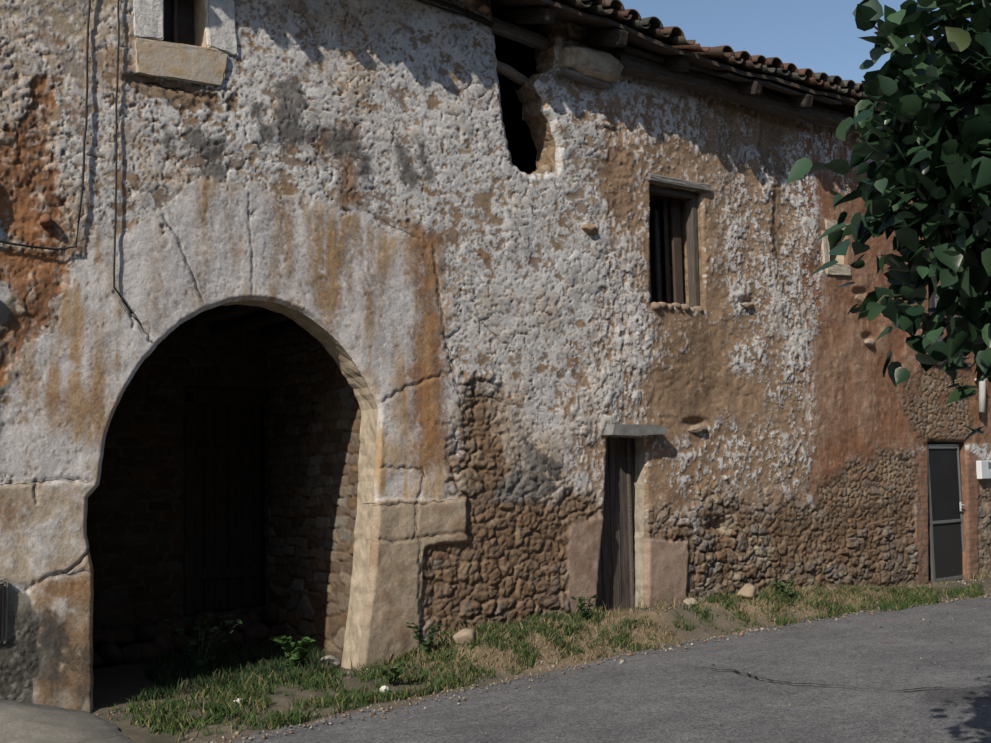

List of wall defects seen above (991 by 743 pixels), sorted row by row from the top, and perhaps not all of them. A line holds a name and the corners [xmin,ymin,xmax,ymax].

crack [138,82,211,97]
water stain [161,127,230,177]
water stain [251,76,372,181]
flaking render [0,73,73,387]
crack [115,293,156,346]
flaking render [672,126,973,530]